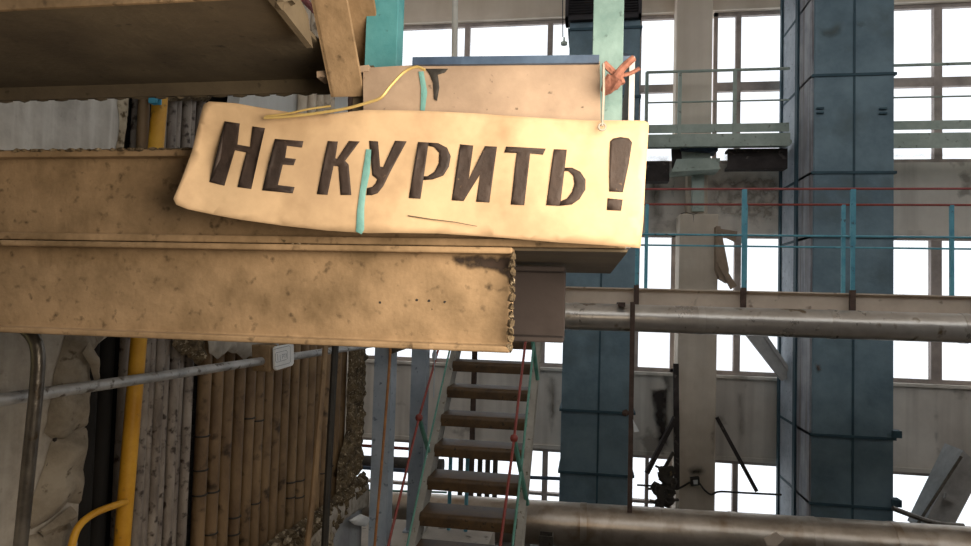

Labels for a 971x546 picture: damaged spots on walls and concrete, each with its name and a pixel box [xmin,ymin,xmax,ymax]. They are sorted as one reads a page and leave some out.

flaking render [208,341,260,360]
peeling [28,335,103,546]
flaking render [321,484,369,535]